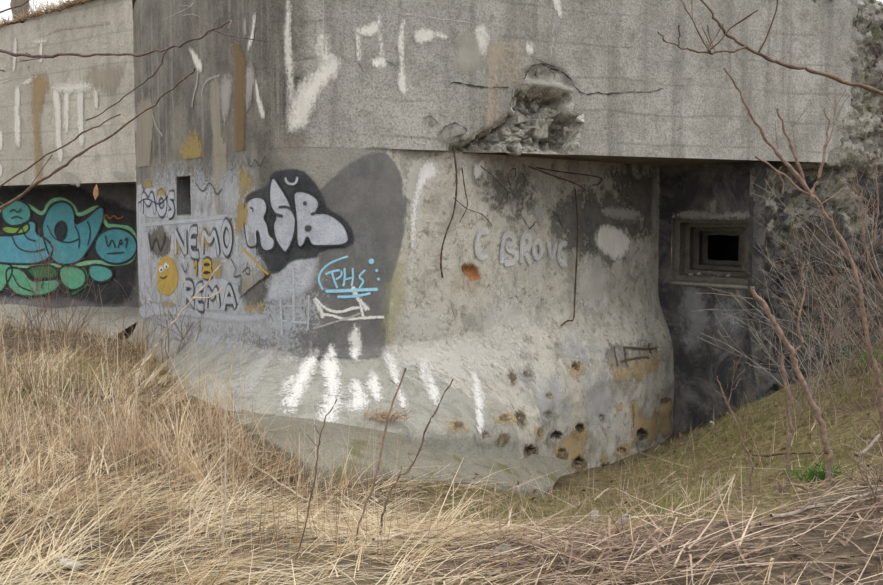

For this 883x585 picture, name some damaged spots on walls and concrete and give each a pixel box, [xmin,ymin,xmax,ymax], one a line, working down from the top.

damp [14,77,33,148]
crack [448,81,509,89]
crack [573,85,663,95]
spalling [423,59,585,278]
peeling [480,166,641,326]
corrosion [462,263,482,282]
spalling [570,360,585,377]
spalling [605,339,661,384]
spalling [448,390,588,472]
spalling [636,429,648,449]